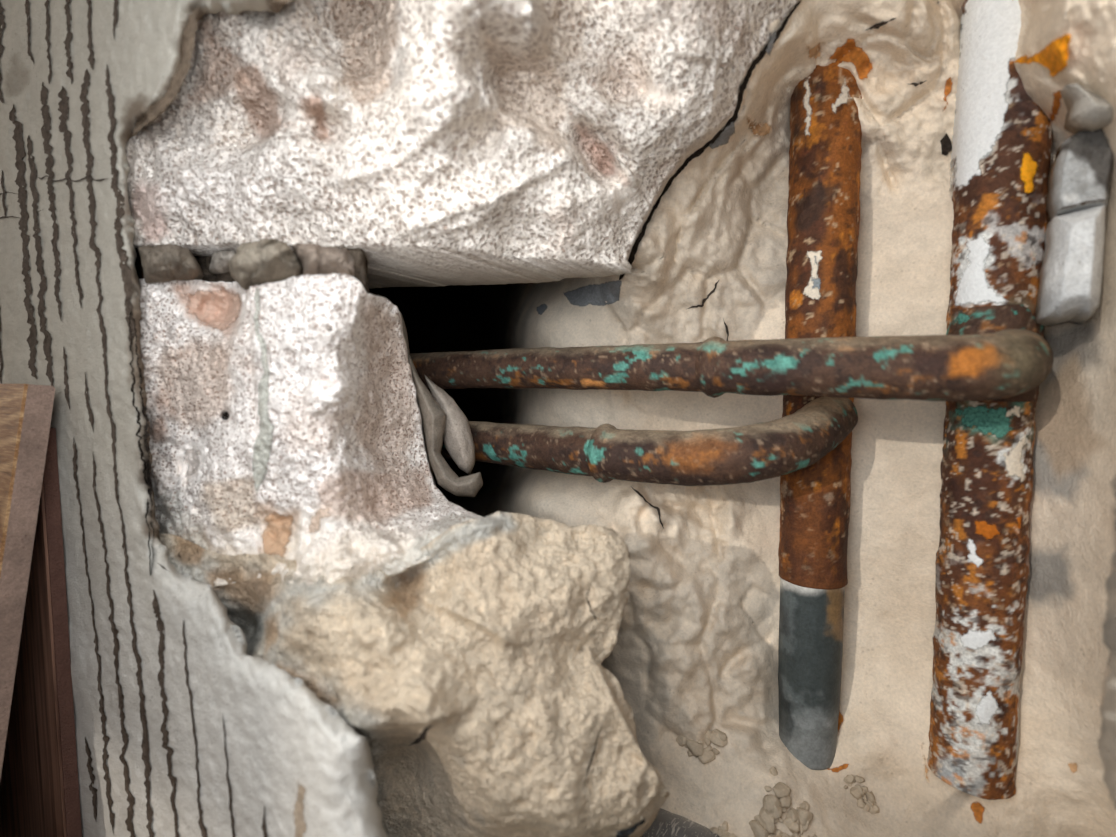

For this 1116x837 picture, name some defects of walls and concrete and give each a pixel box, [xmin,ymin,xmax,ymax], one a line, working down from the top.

rust [809,39,873,80]
rust [1014,34,1072,77]
rust [944,78,953,110]
rust [1050,91,1061,121]
crack [619,0,801,280]
spalling [126,0,799,837]